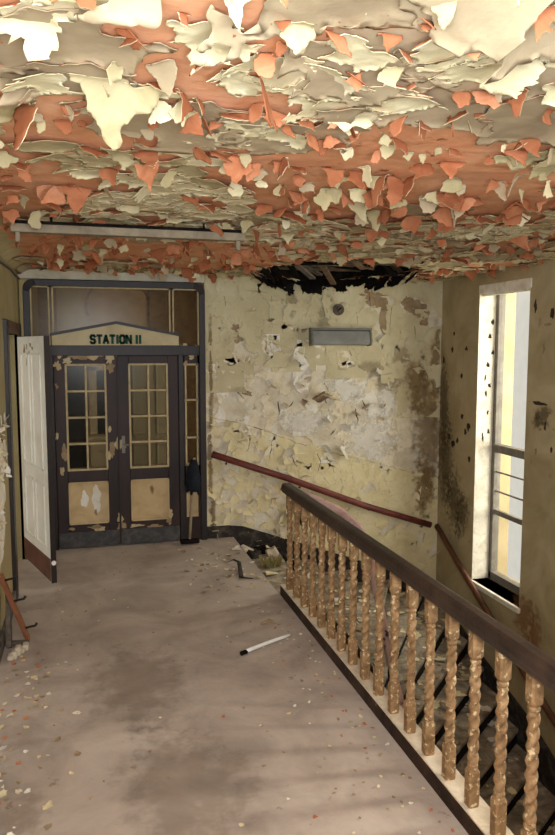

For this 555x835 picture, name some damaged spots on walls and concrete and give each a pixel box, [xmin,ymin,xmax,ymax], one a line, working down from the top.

peeling [0,0,555,579]
leakage [407,329,440,517]